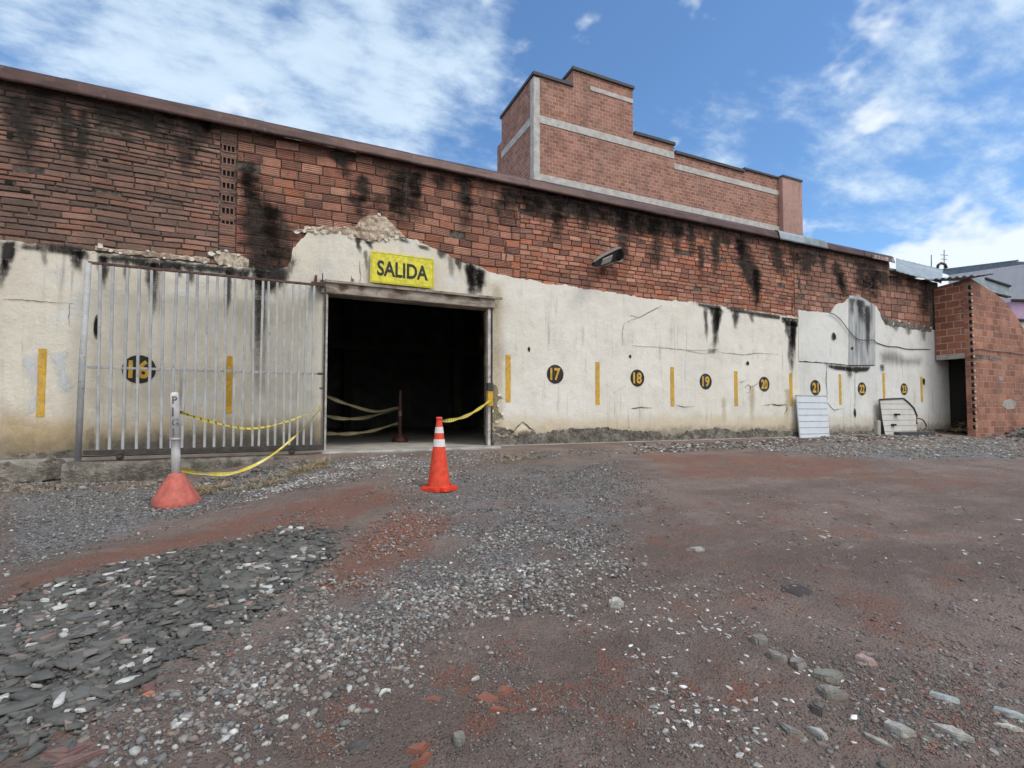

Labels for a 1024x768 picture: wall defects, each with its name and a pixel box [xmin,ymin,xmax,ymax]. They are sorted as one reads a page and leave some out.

leakage [4,91,213,165]
leakage [328,151,473,225]
leakage [0,161,295,356]
peeling [189,249,240,268]
flaking render [294,213,407,242]
leakage [399,239,485,294]
leakage [493,186,798,367]
leakage [771,248,929,347]
flaking render [493,384,797,445]